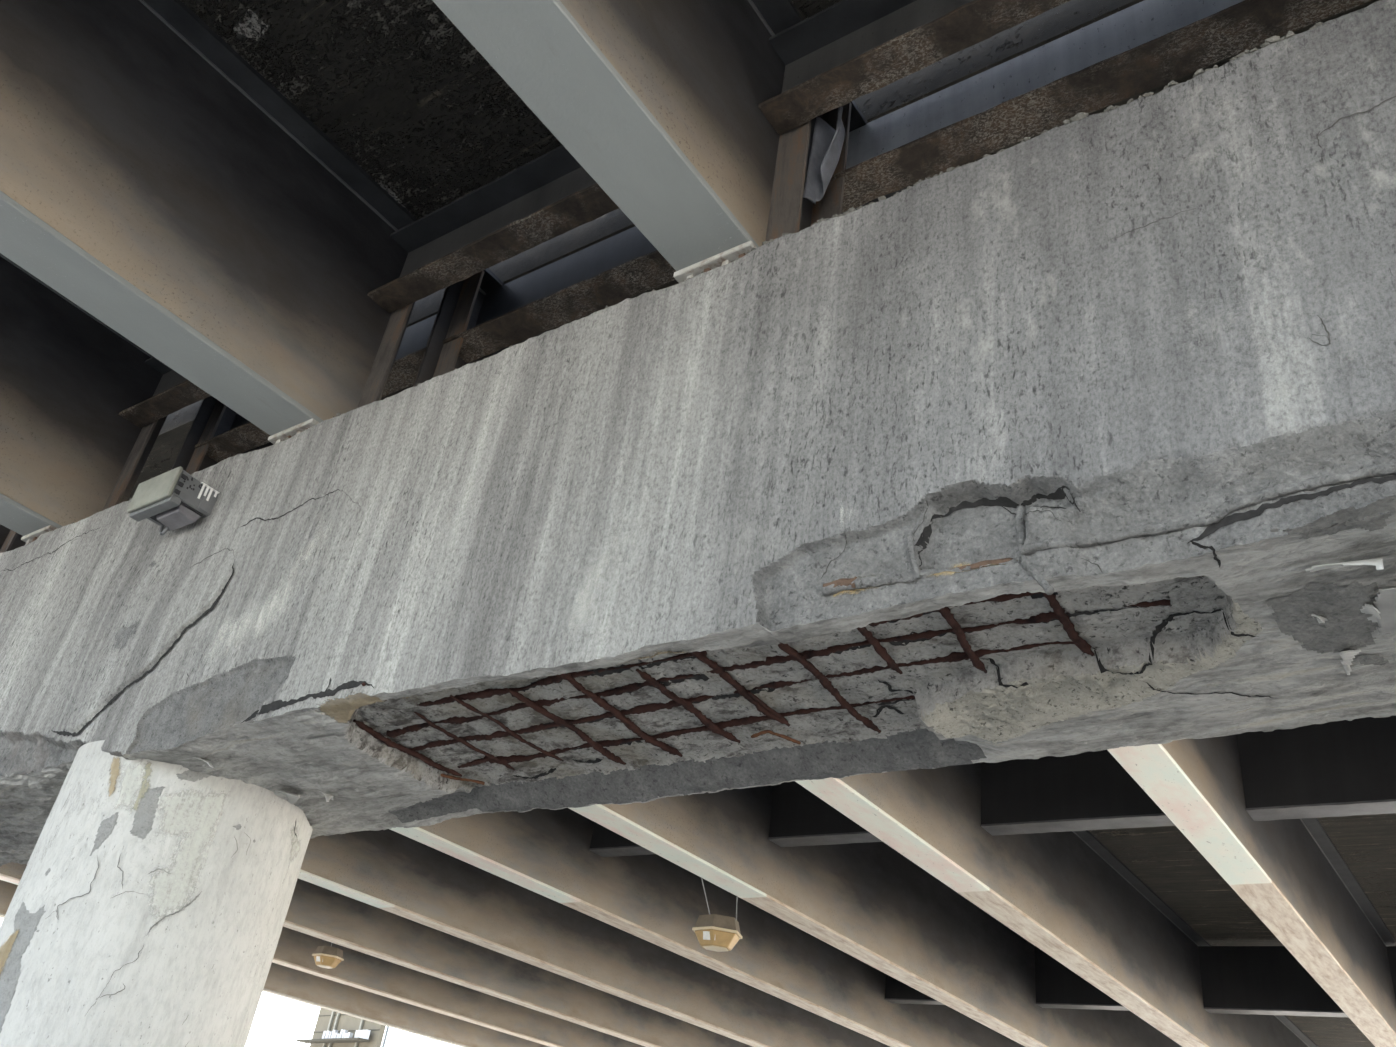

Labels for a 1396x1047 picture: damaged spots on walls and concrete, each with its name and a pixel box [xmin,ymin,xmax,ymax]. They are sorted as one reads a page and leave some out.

crack [53,489,374,737]
spalling [318,410,1396,823]
peeling [0,730,128,777]
peeling [90,757,214,856]
peeling [0,902,46,1033]